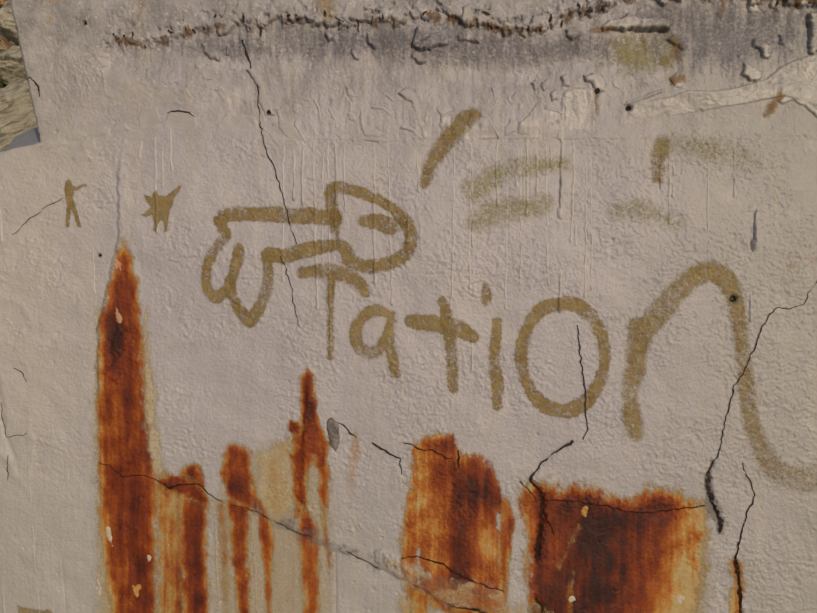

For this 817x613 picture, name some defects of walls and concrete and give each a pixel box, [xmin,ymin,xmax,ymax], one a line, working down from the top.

peeling [312,1,566,65]
peeling [577,0,685,51]
peeling [623,0,817,119]
peeling [341,73,620,146]
corrosion [95,238,274,613]
crack [337,422,460,475]
crack [520,282,817,613]
crack [100,463,312,537]
corrosion [288,368,331,613]
corrosion [399,433,710,613]
crack [402,556,504,592]
corrosion [729,560,745,613]